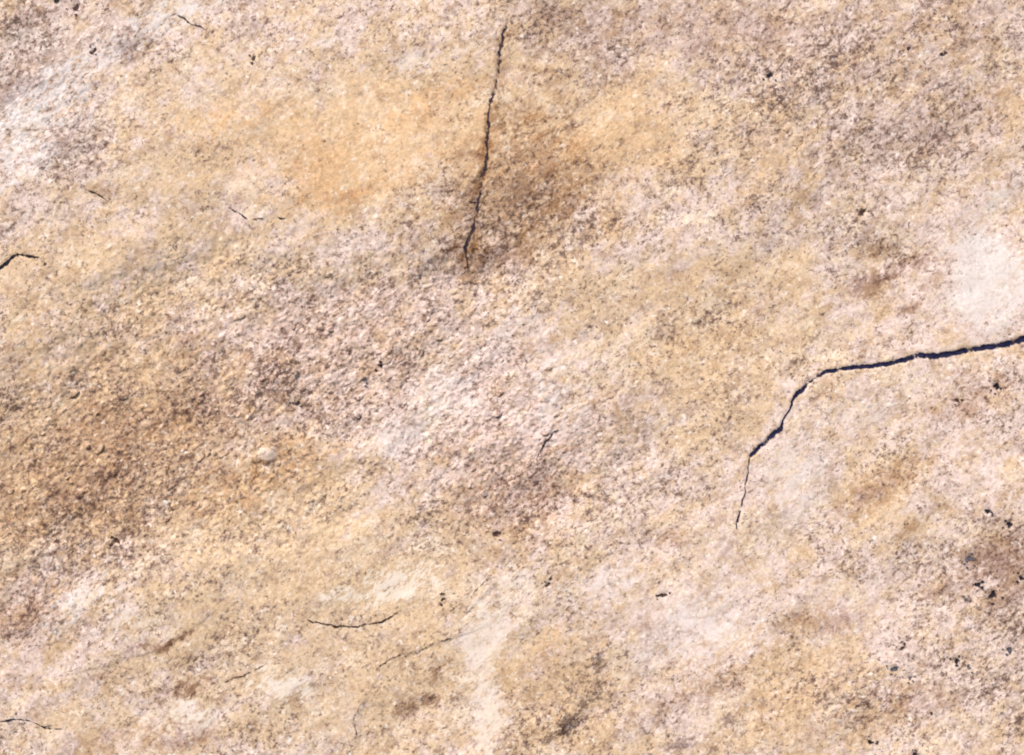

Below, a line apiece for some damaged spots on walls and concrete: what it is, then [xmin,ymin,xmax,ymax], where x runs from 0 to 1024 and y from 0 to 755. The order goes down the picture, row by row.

crack [457,25,507,267]
crack [735,335,1024,566]